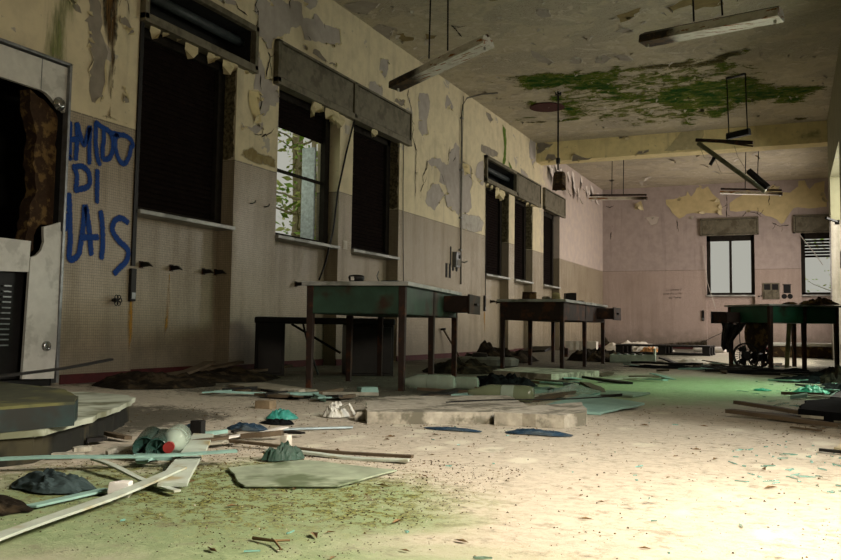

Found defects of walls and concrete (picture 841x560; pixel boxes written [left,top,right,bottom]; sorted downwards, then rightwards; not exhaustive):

peeling [68,0,108,104]
rust [103,0,118,76]
peeling [150,0,345,134]
peeling [611,1,647,35]
peeling [660,0,725,18]
peeling [425,117,599,216]
peeling [666,180,828,224]